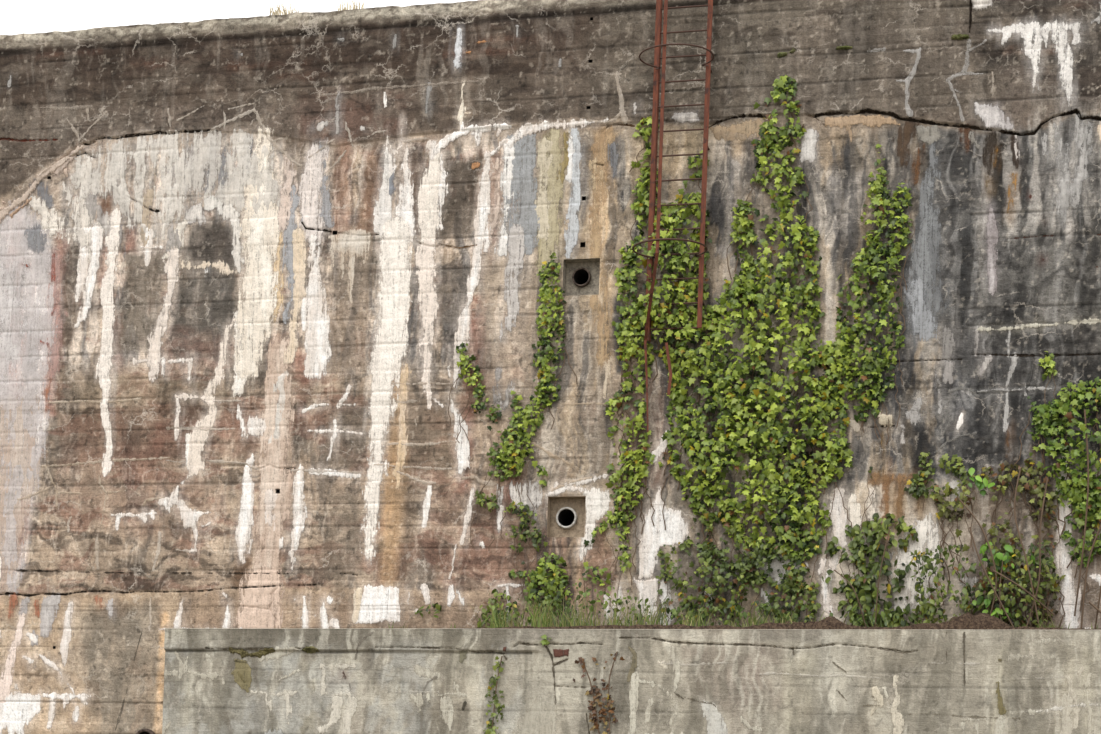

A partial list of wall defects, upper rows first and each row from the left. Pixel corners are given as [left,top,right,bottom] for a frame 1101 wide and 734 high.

leakage [453,28,462,68]
leakage [972,0,992,11]
crack [0,129,218,158]
crack [709,113,764,128]
crack [808,108,1101,136]
leakage [974,102,1020,160]
leakage [986,2,1101,223]
leakage [904,143,1101,432]
leakage [0,80,619,734]
leakage [758,486,876,613]
leakage [876,513,940,614]
leakage [1055,456,1101,629]